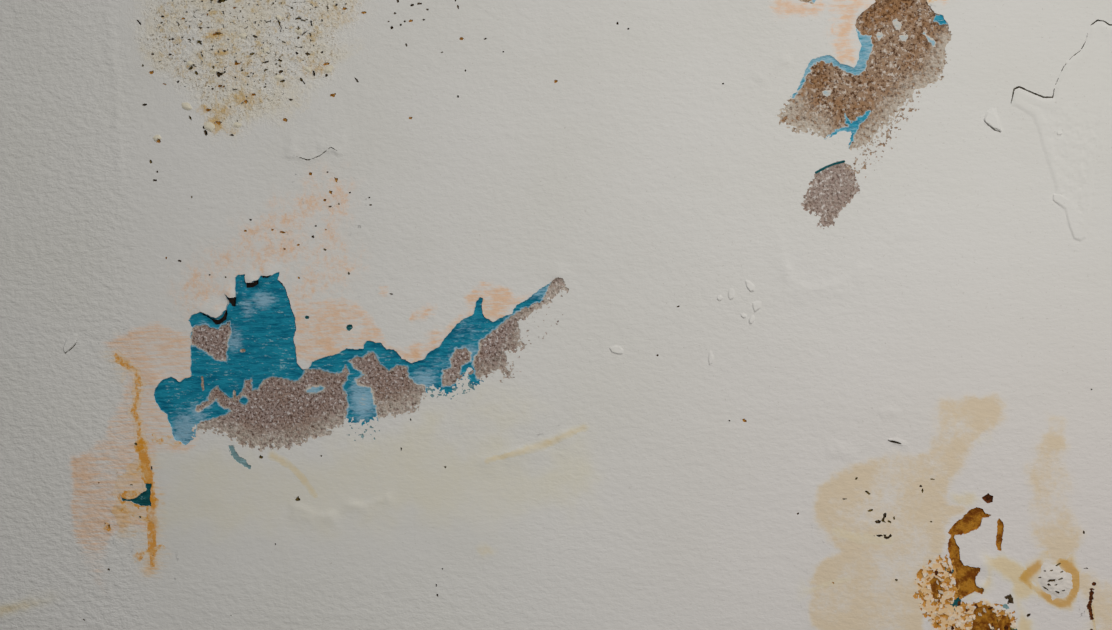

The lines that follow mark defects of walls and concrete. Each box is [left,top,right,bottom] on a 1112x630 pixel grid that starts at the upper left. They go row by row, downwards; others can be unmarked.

water stain [762,0,876,67]
peeling [775,0,952,229]
water stain [926,0,965,12]
corrosion [86,323,191,598]
water stain [64,150,610,602]
peeling [154,272,569,469]
water stain [789,385,1112,630]